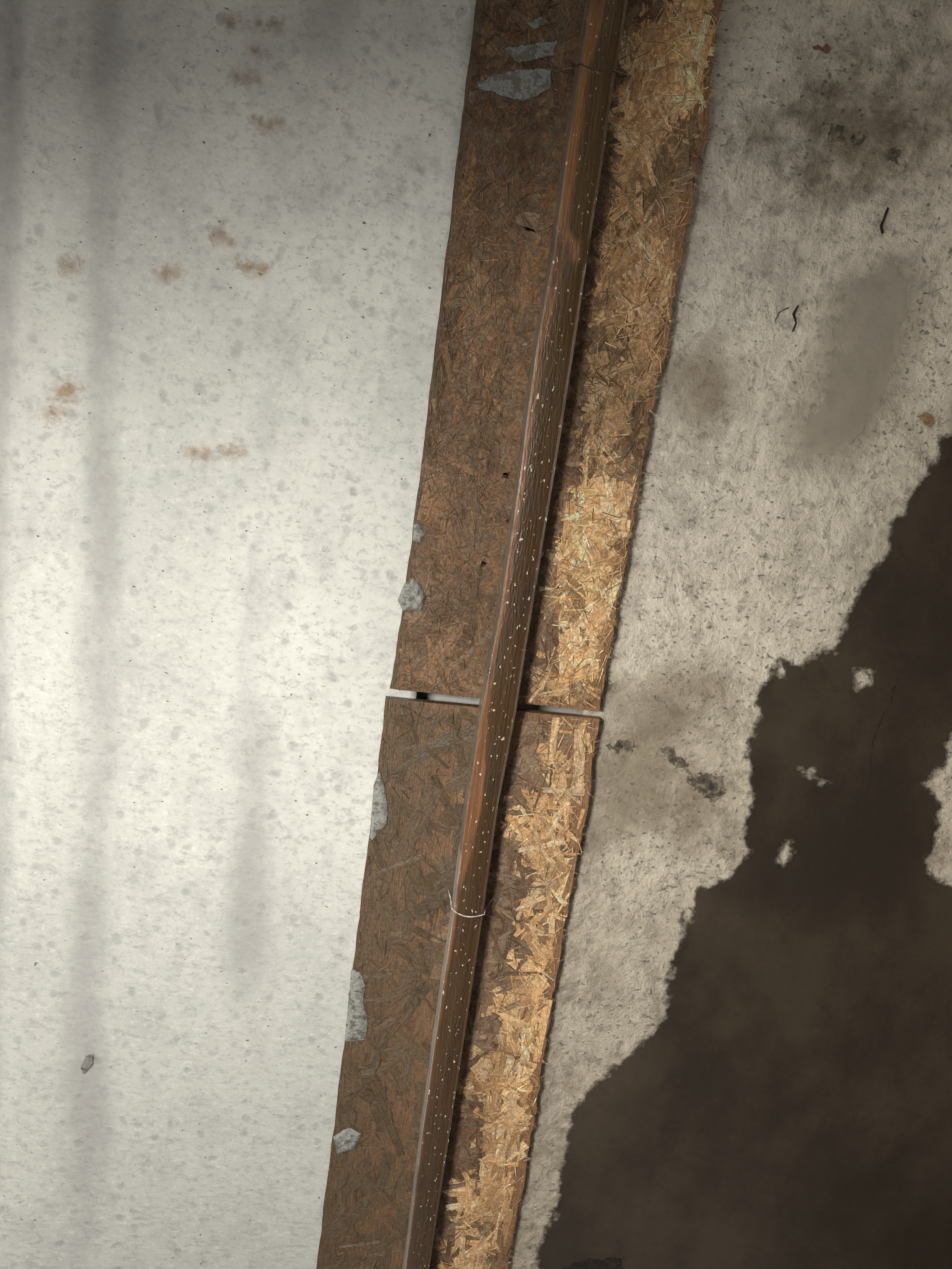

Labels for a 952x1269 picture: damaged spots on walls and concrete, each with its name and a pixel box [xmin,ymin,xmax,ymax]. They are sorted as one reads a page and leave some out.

leakage [800,268,908,460]
leakage [536,436,952,1269]